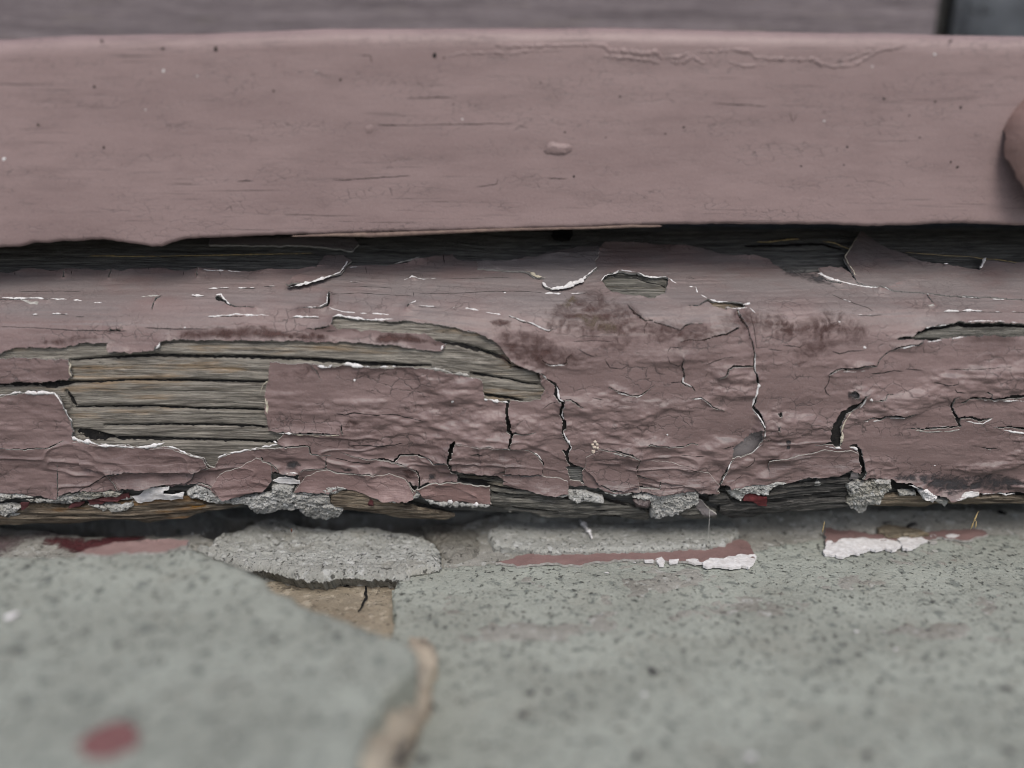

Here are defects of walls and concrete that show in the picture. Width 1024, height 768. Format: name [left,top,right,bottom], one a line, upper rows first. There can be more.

peeling [477,246,676,298]
crack [817,272,888,316]
crack [928,297,1024,313]
peeling [867,320,1024,367]
crack [293,254,803,489]
peeling [0,314,584,509]
crack [820,350,1024,474]
peeling [632,460,720,516]
peeling [743,493,767,506]
peeling [768,449,861,483]
peeling [911,485,937,503]
peeling [958,491,1015,501]